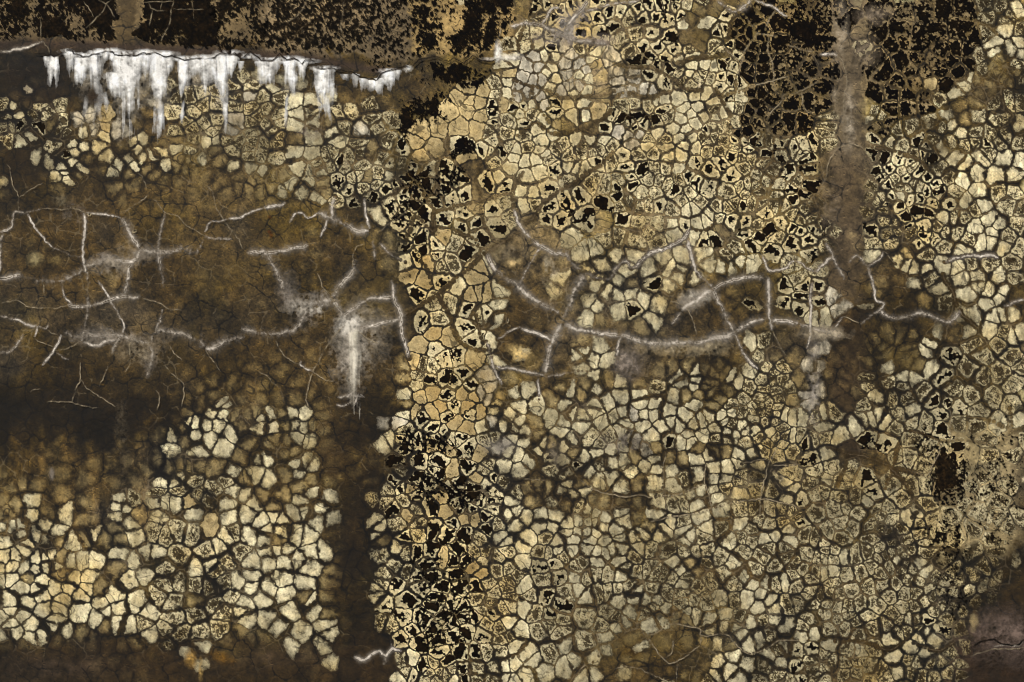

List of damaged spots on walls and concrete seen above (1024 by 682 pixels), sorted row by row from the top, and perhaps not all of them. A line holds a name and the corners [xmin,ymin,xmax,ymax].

leakage [0,0,518,144]
crack [718,0,845,114]
crack [0,177,416,406]
leakage [340,316,374,403]
peeling [354,0,1024,682]
crack [405,186,997,394]
leakage [809,329,840,338]
crack [591,447,796,519]
leakage [914,415,1024,620]
crack [355,647,398,661]
crack [654,624,785,682]
crack [938,639,1023,651]